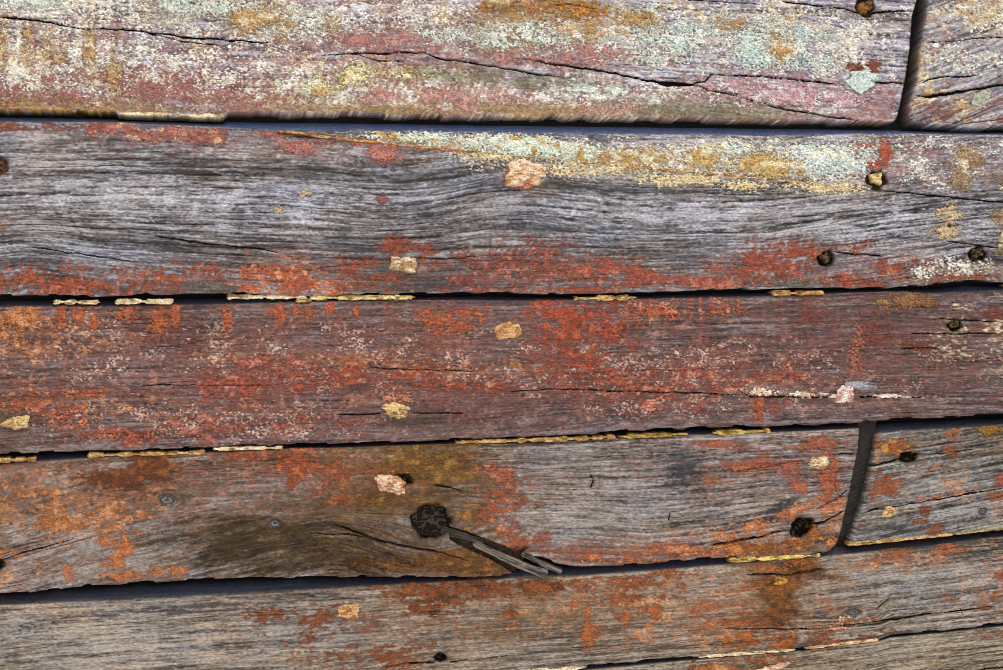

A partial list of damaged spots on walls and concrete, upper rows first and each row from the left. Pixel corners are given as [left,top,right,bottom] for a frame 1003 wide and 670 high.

crack [0,17,268,46]
crack [324,51,857,121]
crack [875,75,1003,98]
peeling [0,233,1003,508]
peeling [0,468,190,582]
peeling [371,432,848,654]
peeling [974,572,1003,610]
peeling [241,603,336,643]
peeling [323,639,437,670]